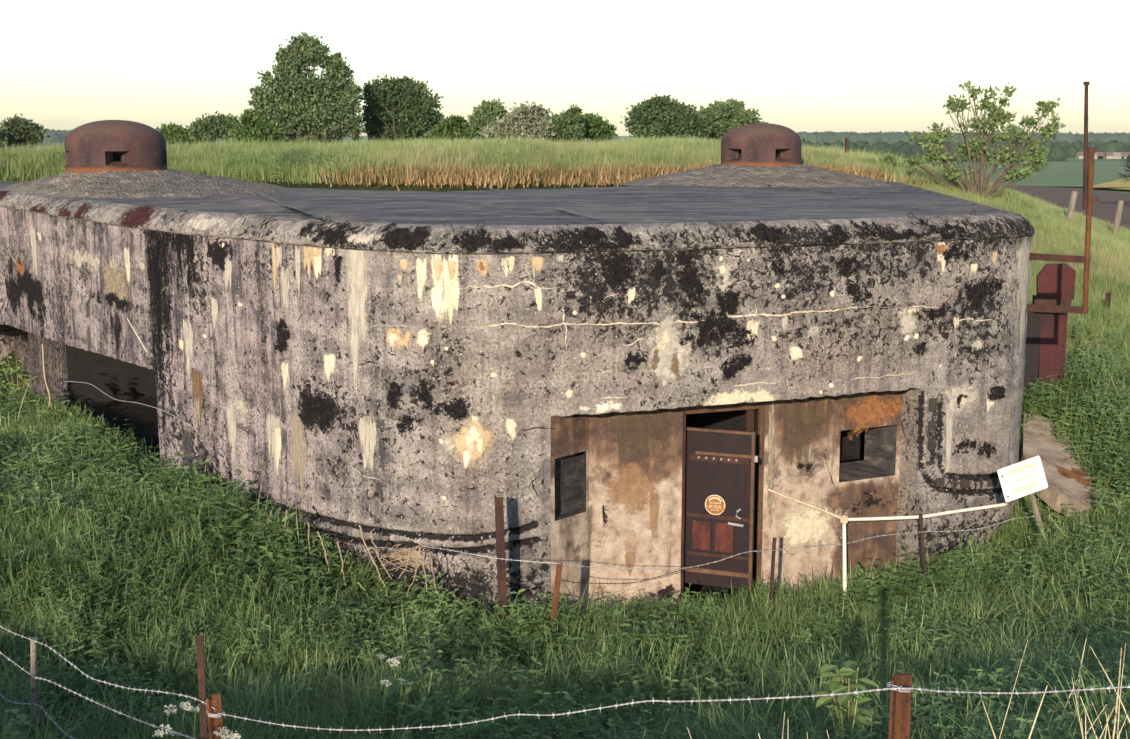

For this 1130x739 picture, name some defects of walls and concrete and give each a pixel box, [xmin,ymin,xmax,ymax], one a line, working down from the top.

damp [17,213,241,452]
damp [266,230,478,504]
peeling [646,306,692,404]
damp [596,250,760,384]
crack [464,281,991,354]
crack [735,379,781,396]
crack [852,371,916,379]
damp [226,404,236,462]
peeling [444,418,517,471]